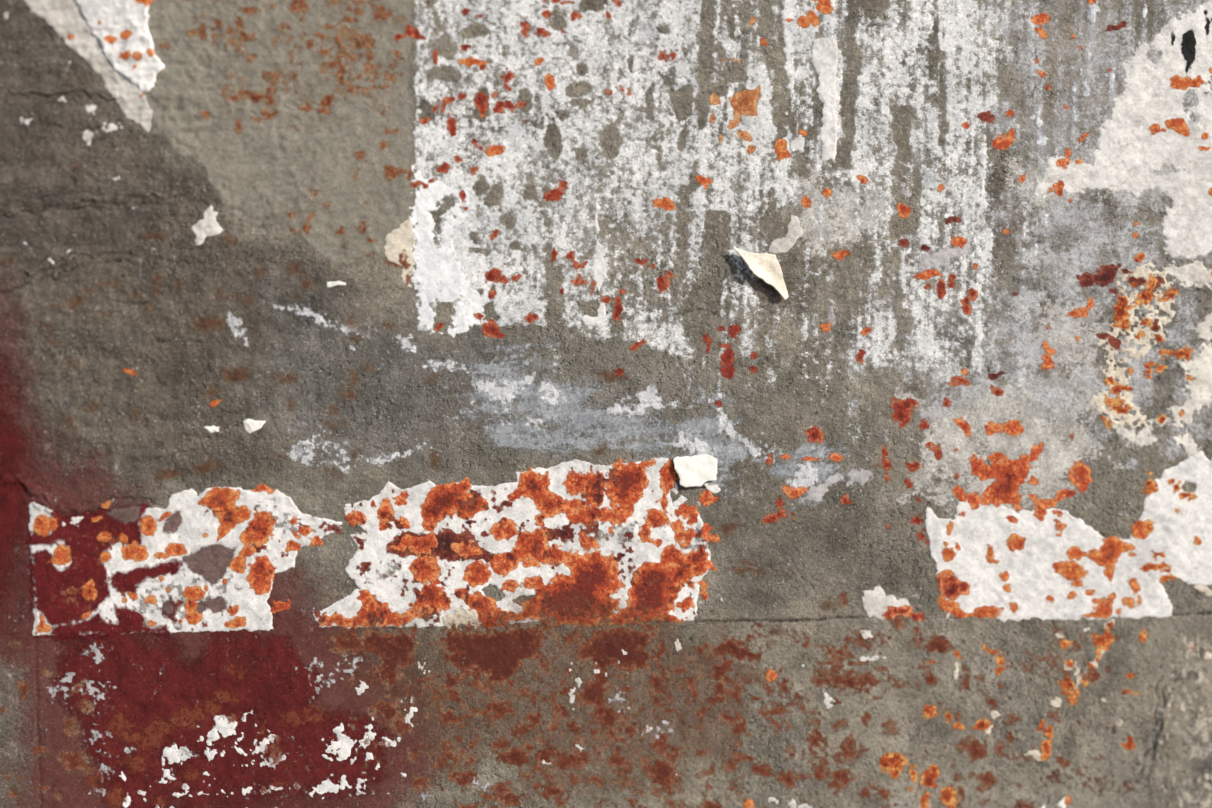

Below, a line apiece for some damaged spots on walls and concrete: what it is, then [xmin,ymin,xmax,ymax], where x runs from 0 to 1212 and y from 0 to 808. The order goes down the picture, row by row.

peeling [141,0,1115,442]
rust [913,269,978,316]
rust [943,368,1025,437]
rust [1065,252,1196,429]
rust [33,500,209,634]
peeling [182,544,236,614]
rust [194,443,1177,808]
peeling [673,446,721,507]
crack [703,615,872,623]
peeling [861,586,917,639]
rust [876,397,1093,628]
peeling [46,643,401,808]